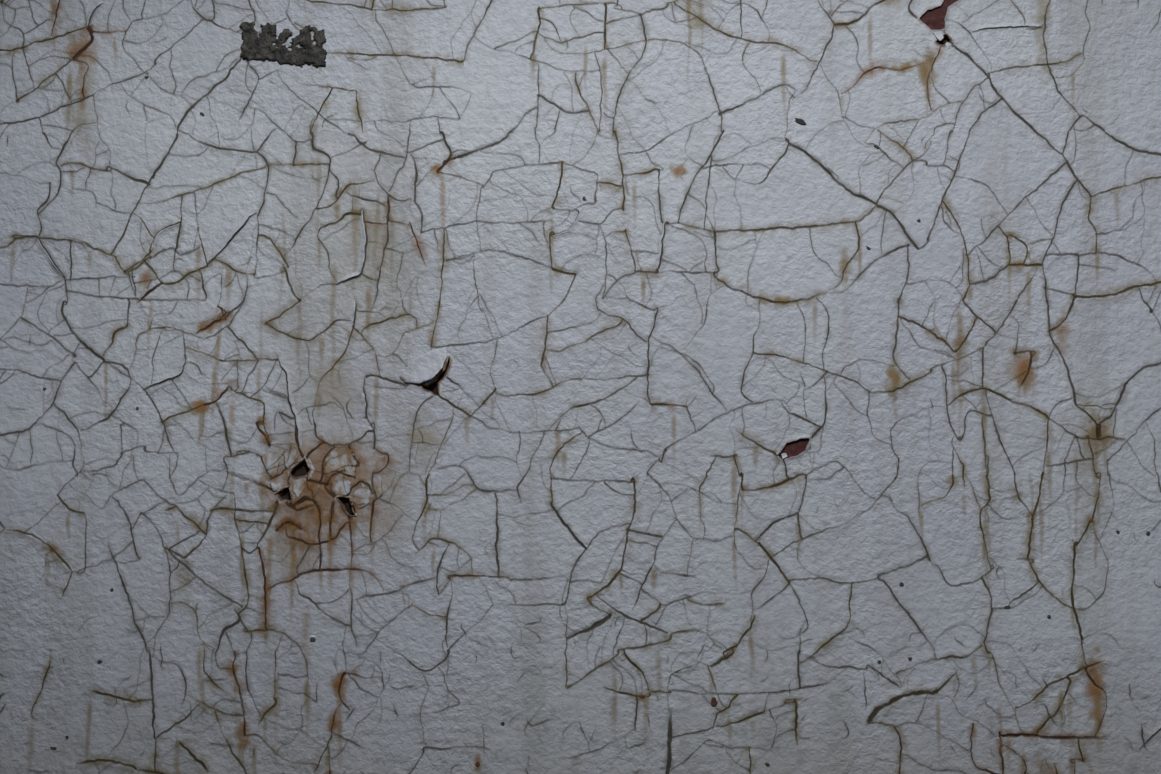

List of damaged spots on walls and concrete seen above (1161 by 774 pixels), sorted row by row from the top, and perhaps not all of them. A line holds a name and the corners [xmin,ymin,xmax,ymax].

peeling [914,0,964,41]
corrosion [893,57,932,77]
peeling [400,347,448,384]
peeling [774,435,814,465]